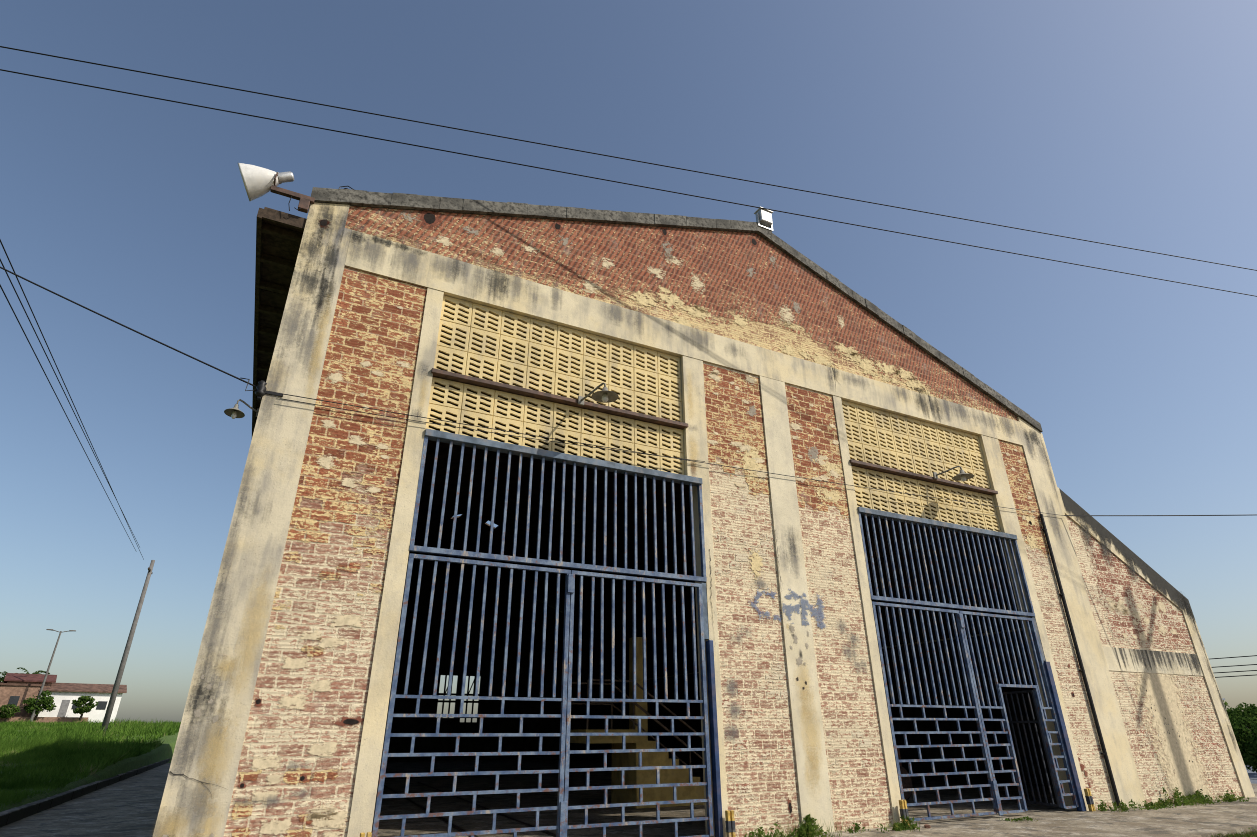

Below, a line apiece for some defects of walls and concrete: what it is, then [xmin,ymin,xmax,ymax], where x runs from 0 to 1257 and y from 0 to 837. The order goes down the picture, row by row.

leakage [294,206,423,317]
leakage [479,269,520,296]
peeling [346,206,1017,420]
leakage [1052,478,1234,740]
crack [170,771,228,797]